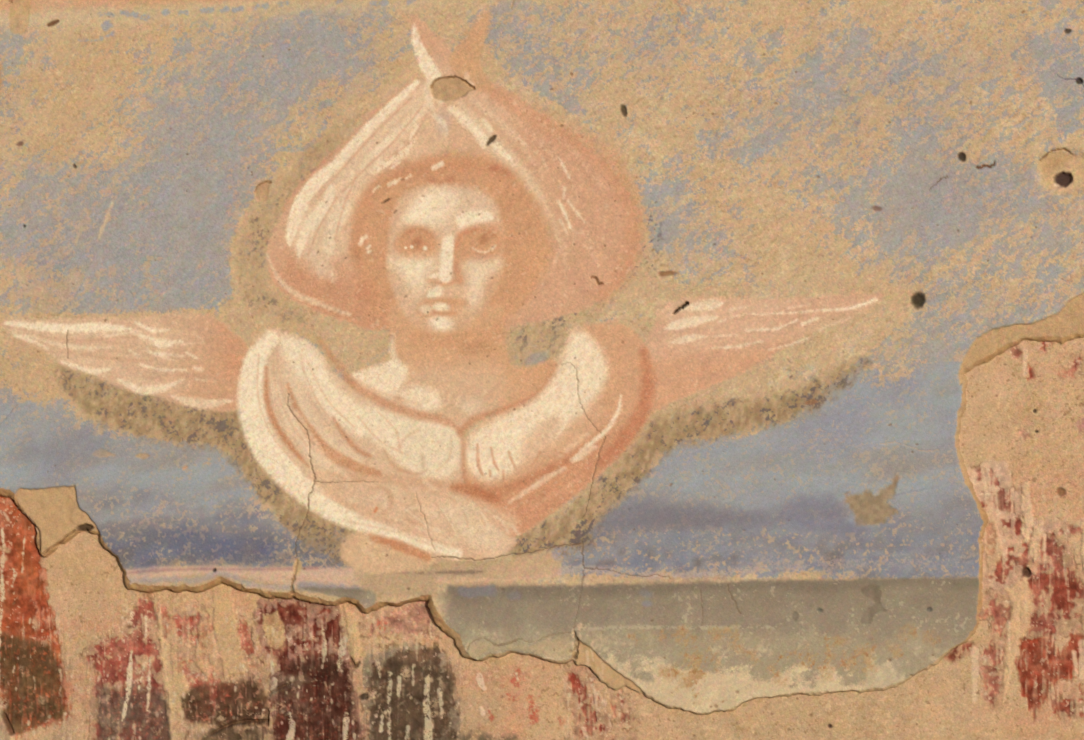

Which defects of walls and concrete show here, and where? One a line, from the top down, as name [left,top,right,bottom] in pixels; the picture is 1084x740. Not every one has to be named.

flaking render [430,75,475,101]
crack [286,393,378,595]
flaking render [0,333,1084,740]
crack [415,362,674,660]